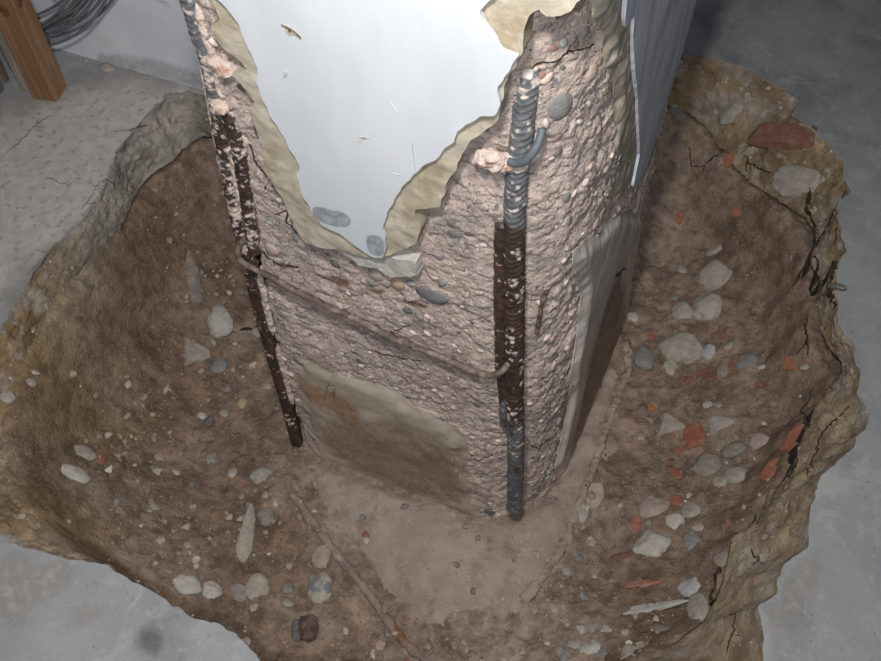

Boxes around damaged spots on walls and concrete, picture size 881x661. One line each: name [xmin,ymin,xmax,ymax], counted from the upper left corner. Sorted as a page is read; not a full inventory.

spalling [0,400,90,563]
spalling [0,0,668,524]
corrosion [324,277,348,286]
spalling [644,54,869,661]
crack [780,387,850,484]
crack [792,187,848,355]
crack [708,567,740,653]